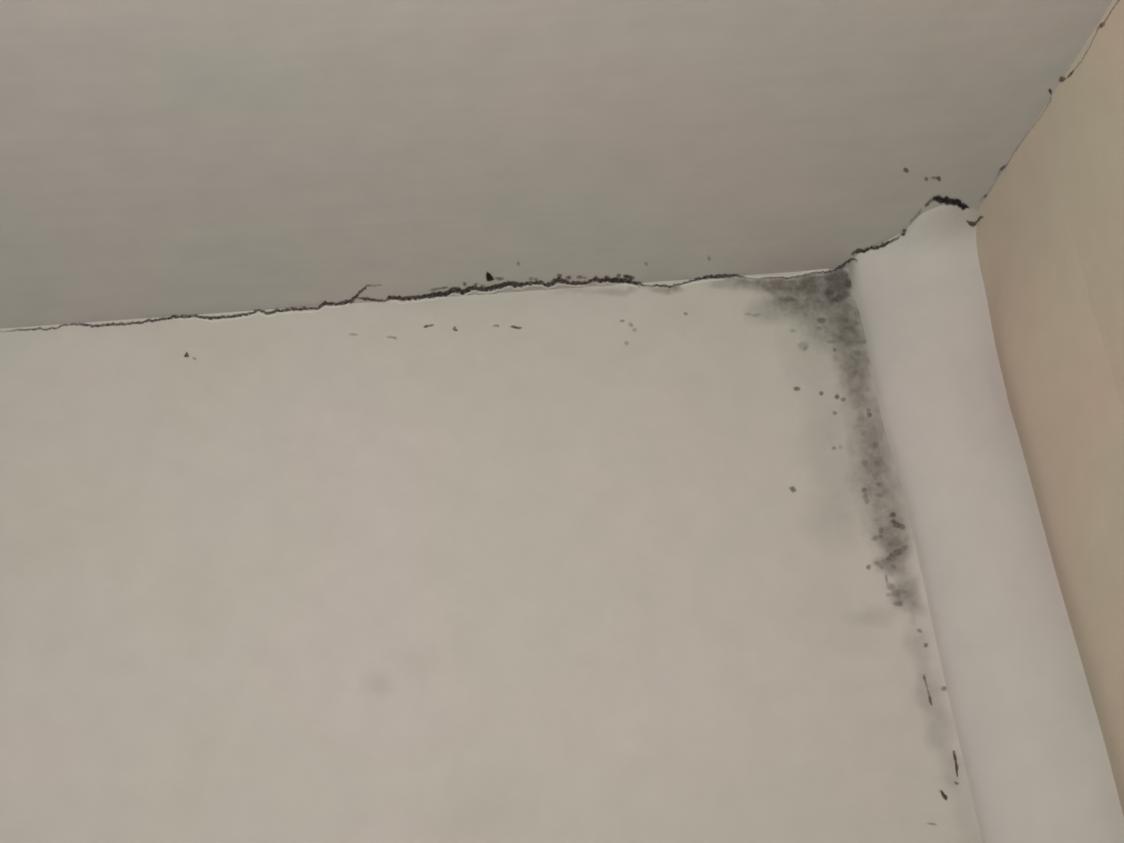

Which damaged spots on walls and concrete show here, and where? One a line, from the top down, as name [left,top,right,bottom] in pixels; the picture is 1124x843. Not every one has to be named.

crack [25,229,907,331]
leakage [764,269,851,301]